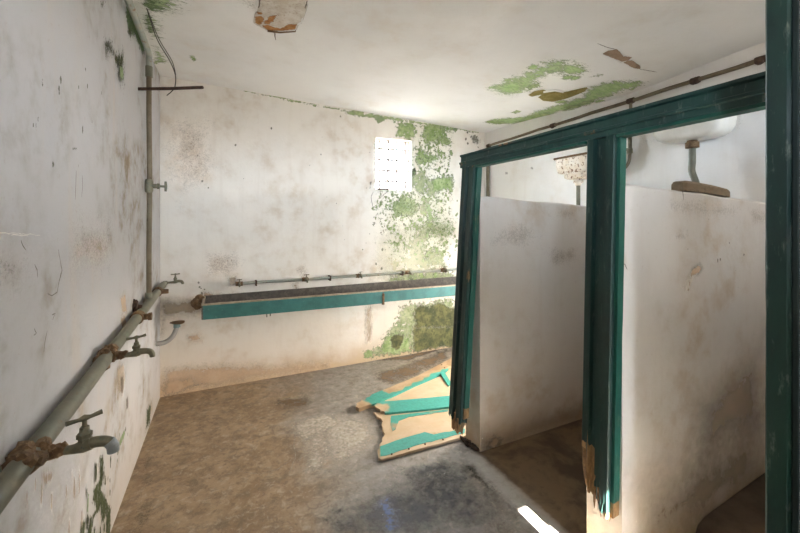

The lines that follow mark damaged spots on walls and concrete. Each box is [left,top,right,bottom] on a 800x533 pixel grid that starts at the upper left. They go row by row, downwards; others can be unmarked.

spalling [254,0,308,33]
mould [490,59,584,94]
mould [486,74,642,125]
flaking render [602,49,641,69]
damp [245,91,479,281]
damp [364,298,454,384]
damp [337,463,494,533]